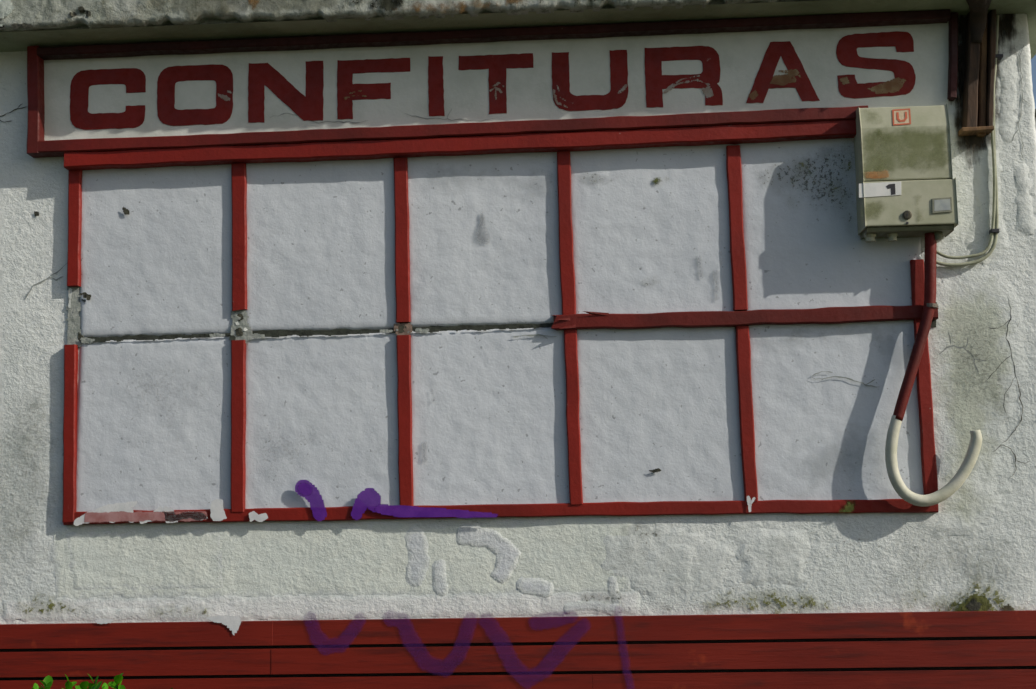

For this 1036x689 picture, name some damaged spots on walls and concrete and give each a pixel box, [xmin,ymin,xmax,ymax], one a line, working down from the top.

peeling [0,0,33,30]
mould [342,0,403,12]
mould [760,146,852,221]
crack [24,263,67,300]
crack [939,299,1029,475]